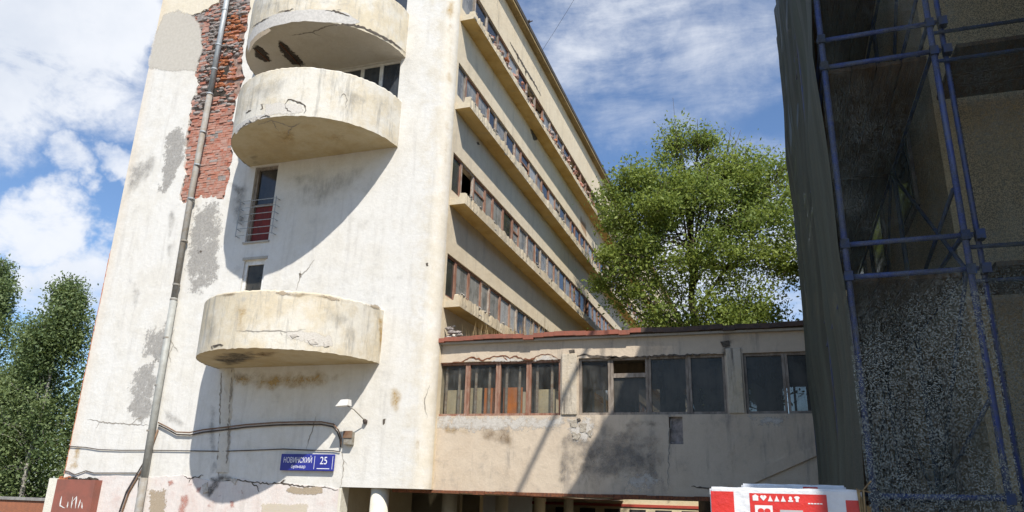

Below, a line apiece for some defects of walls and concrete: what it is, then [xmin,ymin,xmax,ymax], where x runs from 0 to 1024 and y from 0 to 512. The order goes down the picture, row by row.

crack [252,8,349,36]
flaking render [148,0,406,204]
damp [187,201,220,293]
crack [211,330,299,349]
damp [216,353,266,363]
damp [127,323,166,423]
crack [89,416,147,428]
crack [184,370,347,492]
spalling [568,417,594,442]